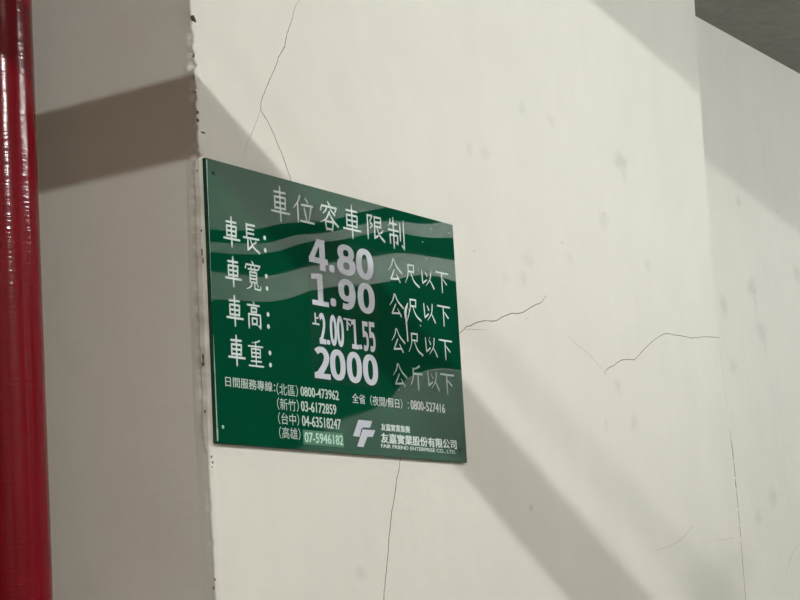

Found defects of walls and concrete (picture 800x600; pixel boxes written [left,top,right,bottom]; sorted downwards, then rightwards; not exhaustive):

crack [244,0,300,181]
crack [460,296,546,333]
crack [570,333,727,406]
crack [384,458,401,592]